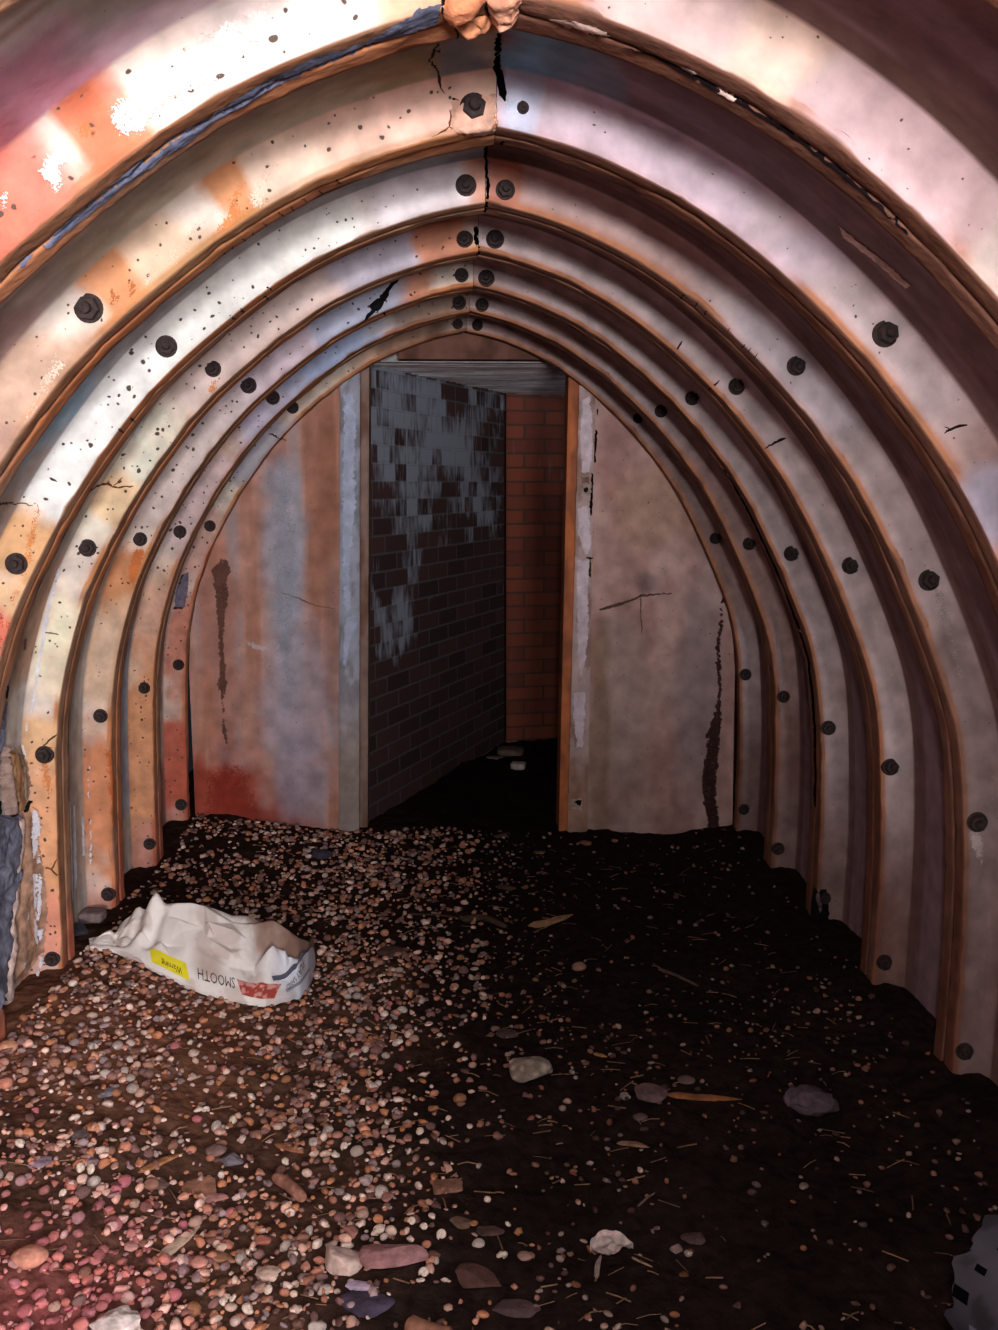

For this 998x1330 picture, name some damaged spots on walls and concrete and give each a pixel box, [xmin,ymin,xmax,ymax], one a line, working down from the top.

crack [484,1,507,102]
spalling [17,0,522,271]
crack [354,274,413,329]
peeling [16,353,66,427]
crack [764,437,786,449]
crack [599,592,672,633]
crack [721,467,817,807]
corrosion [200,760,271,822]
spalling [0,685,33,1009]